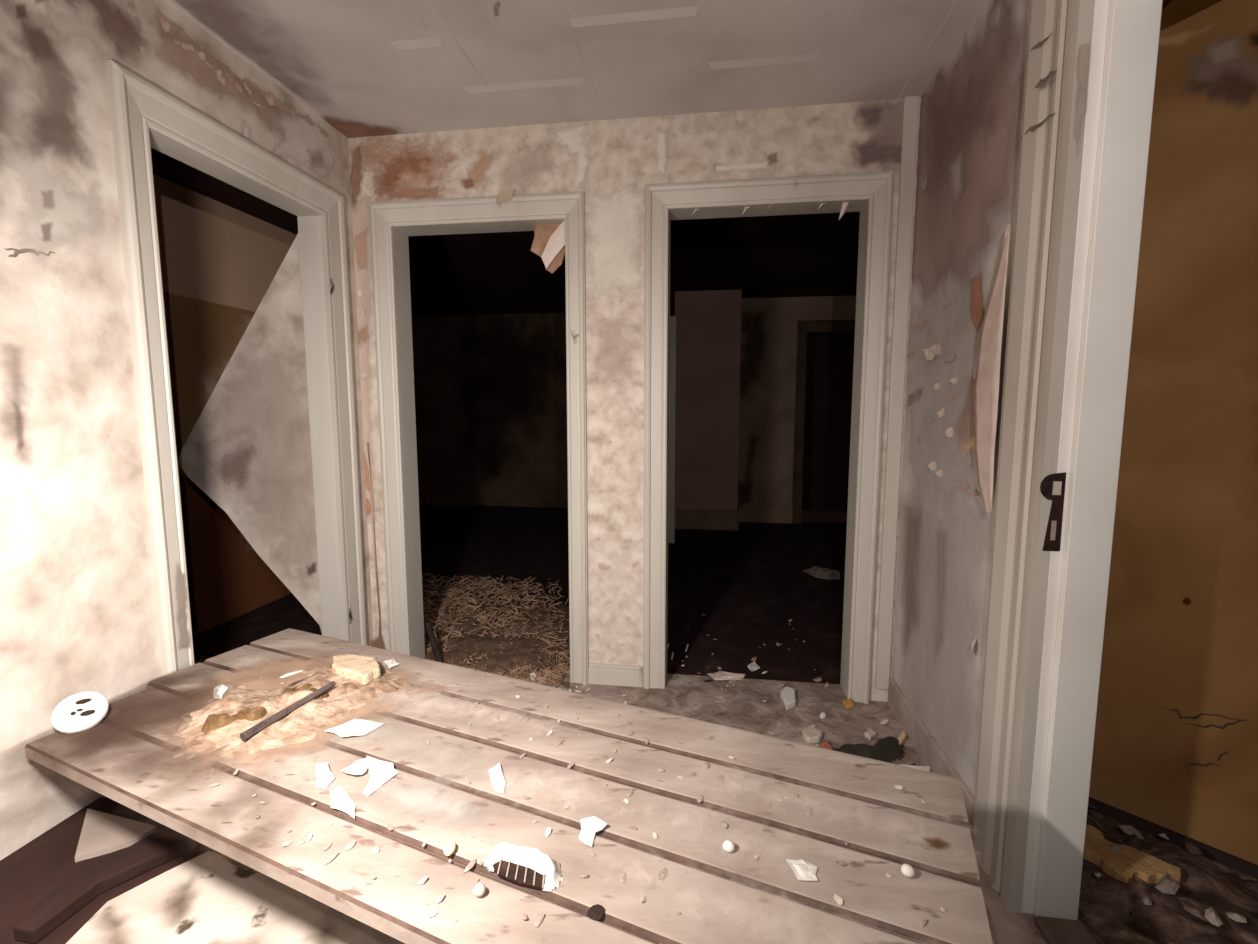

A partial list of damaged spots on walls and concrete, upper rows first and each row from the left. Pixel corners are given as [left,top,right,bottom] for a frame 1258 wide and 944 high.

peeling [9,60,40,127]
leakage [17,0,76,152]
leakage [67,0,139,54]
peeling [157,10,330,142]
leakage [1161,0,1223,23]
peeling [908,224,1011,513]